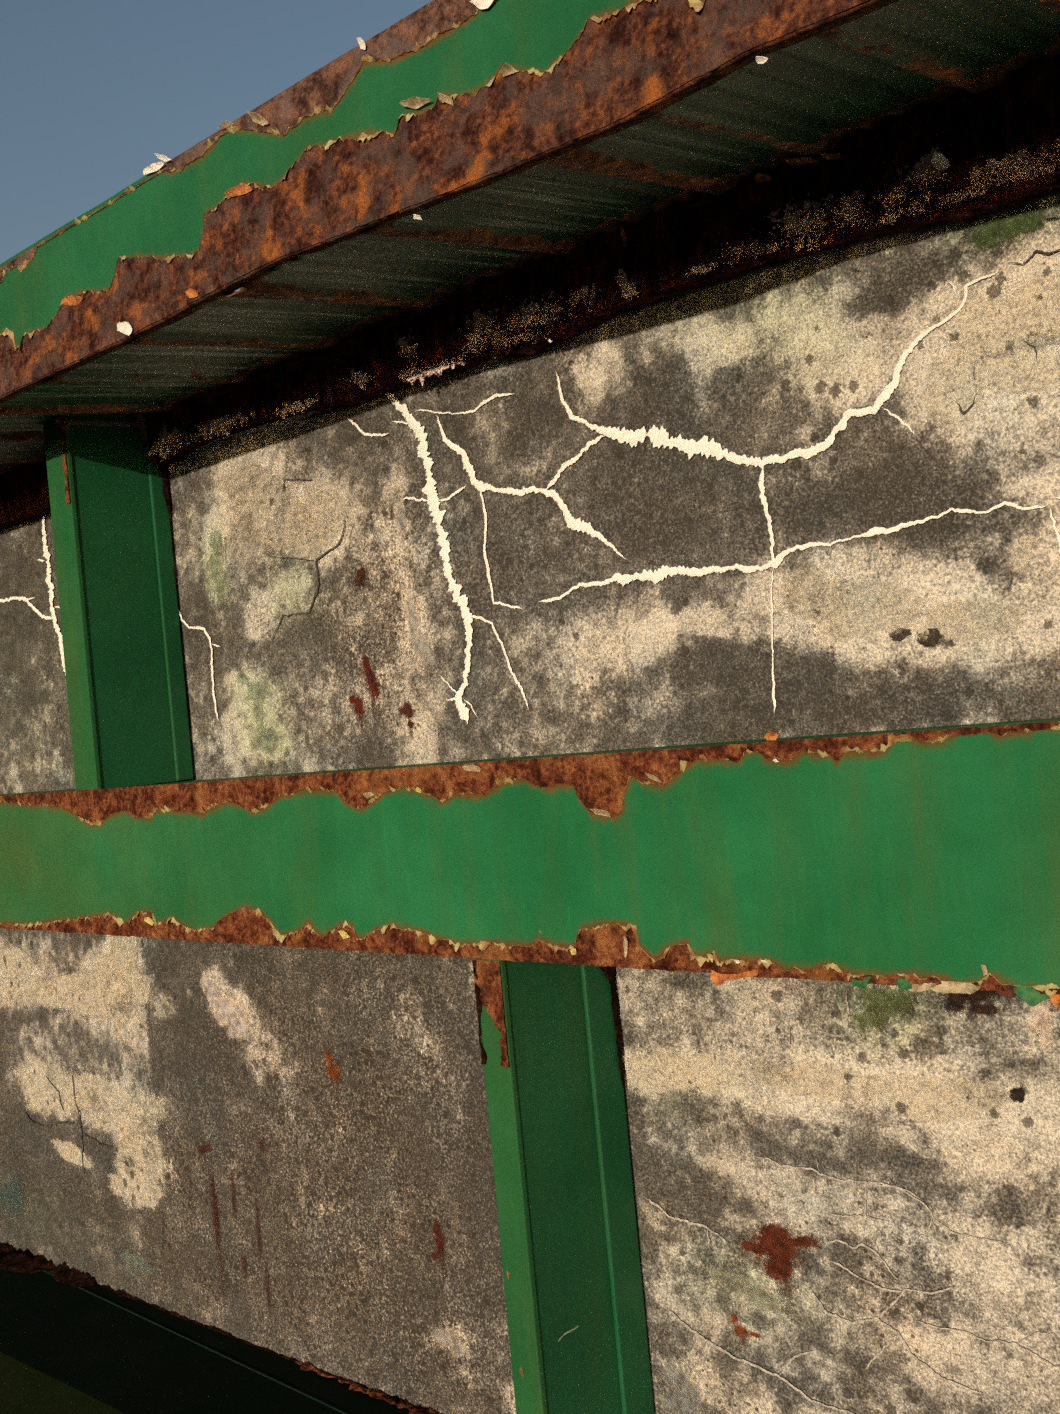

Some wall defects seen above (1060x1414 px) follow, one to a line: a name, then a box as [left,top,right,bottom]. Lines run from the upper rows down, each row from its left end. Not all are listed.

corrosion [0,0,868,396]
corrosion [137,55,1060,587]
flaking render [922,276,1060,425]
crack [0,514,66,676]
crack [179,611,221,719]
flaking render [216,458,345,558]
crack [347,249,1060,724]
flaking render [781,563,1024,647]
flaking render [1010,534,1033,575]
corrosion [0,722,1060,826]
corrosion [740,1224,821,1281]
corrosion [0,1243,439,1414]